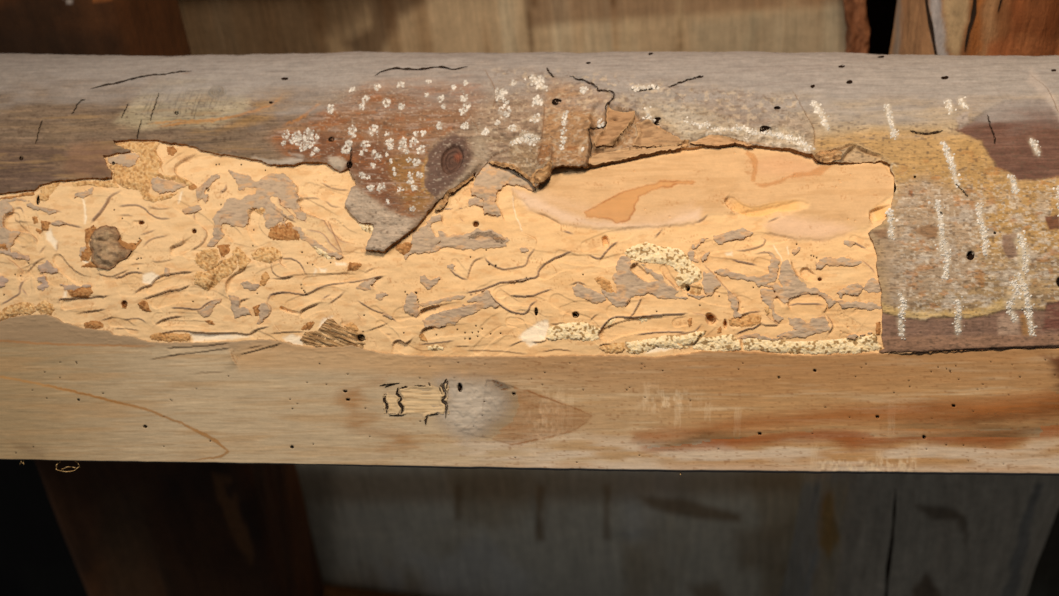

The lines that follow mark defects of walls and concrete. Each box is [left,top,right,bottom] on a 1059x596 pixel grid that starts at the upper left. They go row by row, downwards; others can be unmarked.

crack [71,70,190,138]
crack [375,66,468,76]
peeling [587,105,753,169]
damp [940,141,962,188]
peeling [0,198,91,291]
peeling [151,170,344,259]
peeling [404,164,536,259]
peeling [572,228,1059,353]
damp [898,293,907,340]
damp [928,199,951,281]
damp [975,203,990,256]
damp [1006,230,1035,323]